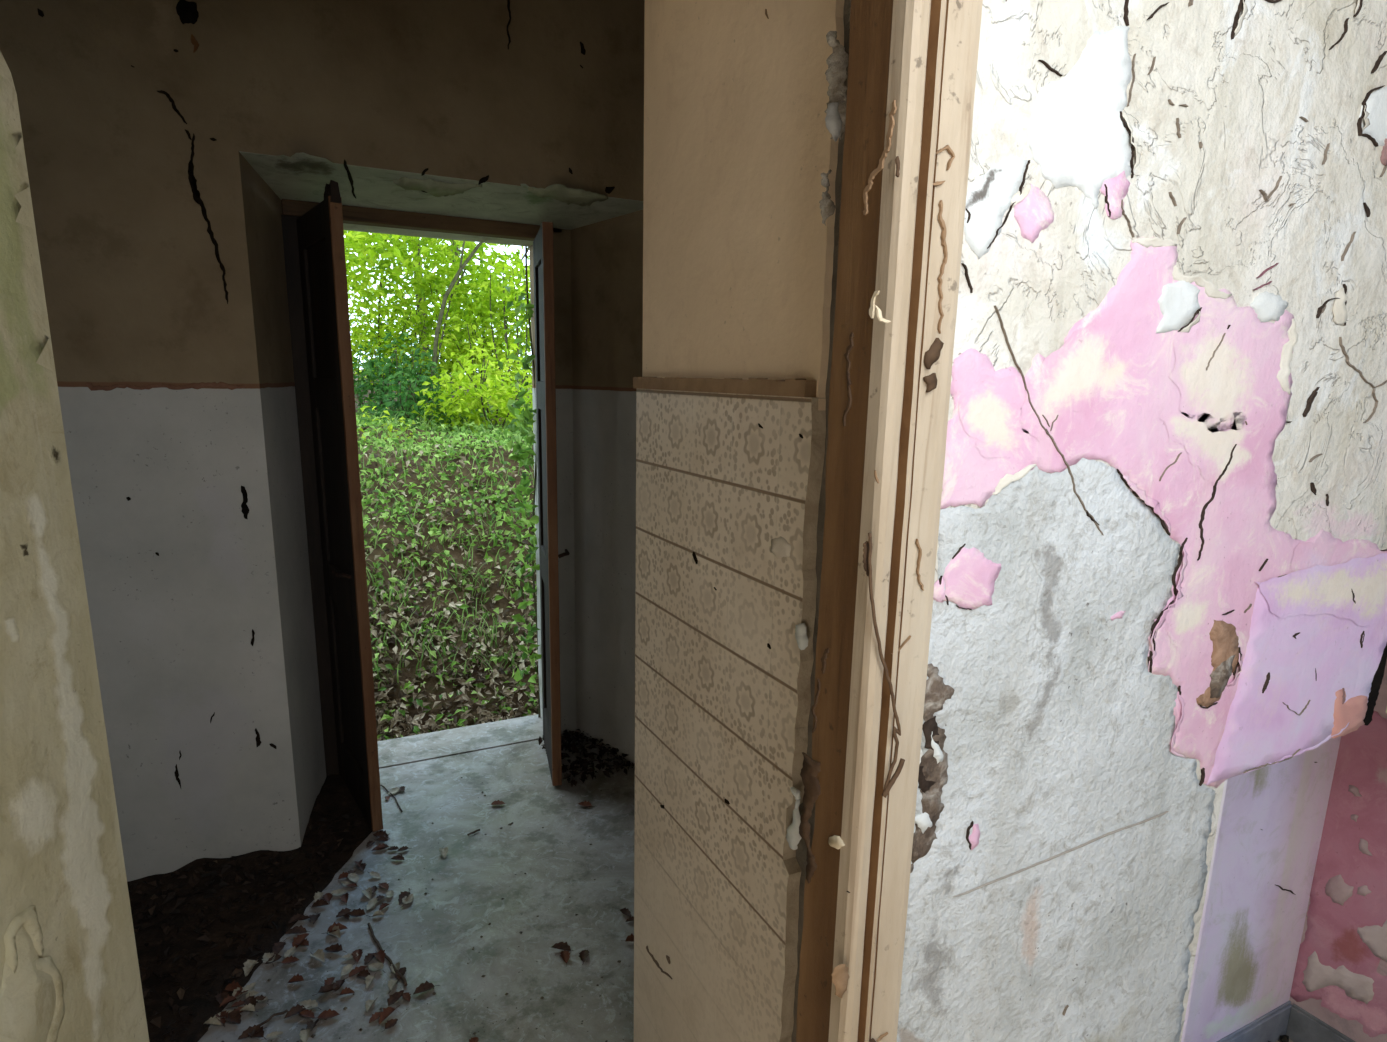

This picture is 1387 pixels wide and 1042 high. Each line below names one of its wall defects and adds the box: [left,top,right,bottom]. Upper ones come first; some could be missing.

crack [157,90,228,304]
peeling [862,25,1387,1042]